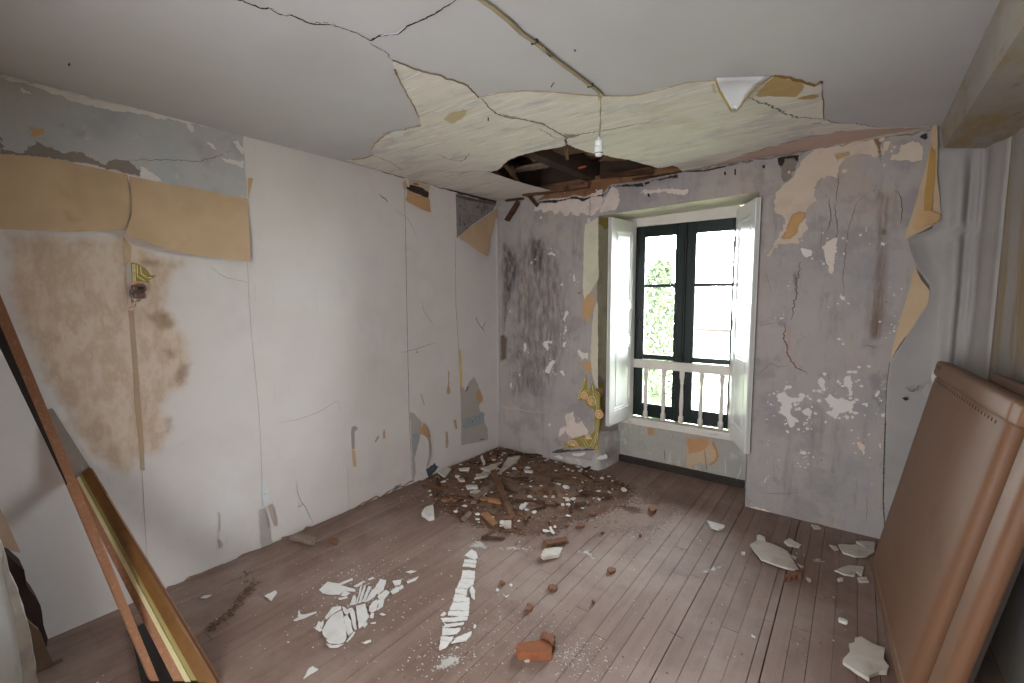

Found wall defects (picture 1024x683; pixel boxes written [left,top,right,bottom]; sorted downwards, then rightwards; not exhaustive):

crack [238,0,456,59]
peeling [0,76,253,262]
peeling [347,60,931,389]
crack [820,176,867,296]
leakage [0,229,196,483]
peeling [459,349,488,445]
mould [498,219,582,412]
spalling [548,411,588,438]
crack [760,262,809,374]
spalling [766,365,886,458]